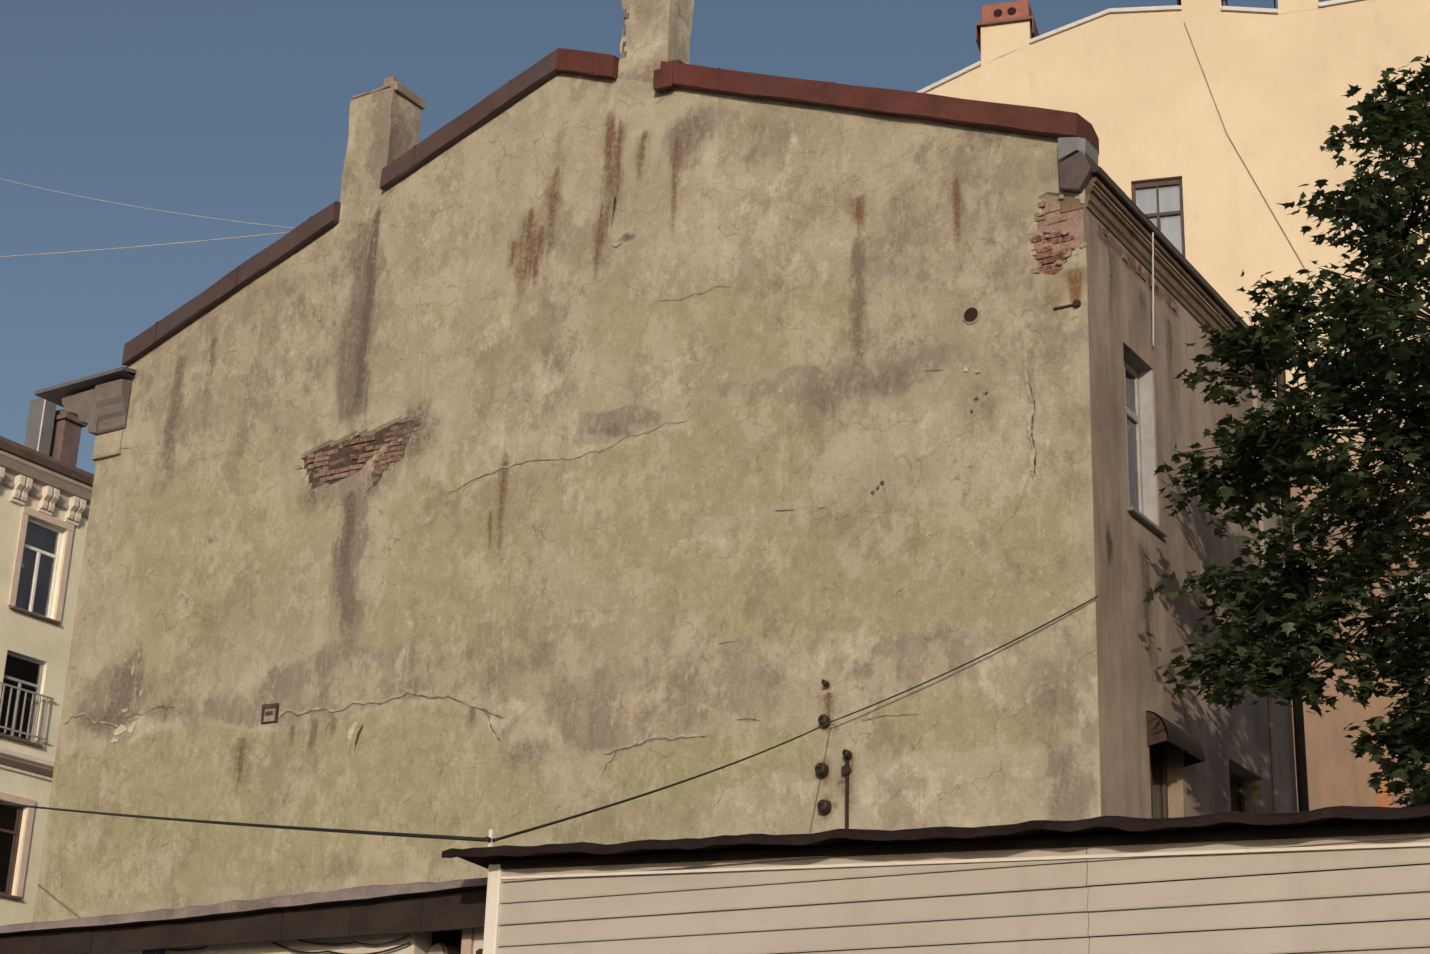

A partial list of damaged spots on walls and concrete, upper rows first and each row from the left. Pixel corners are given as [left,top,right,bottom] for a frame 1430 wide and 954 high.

corrosion [606,117,621,190]
corrosion [511,171,557,279]
flaking render [1031,194,1178,315]
water stain [339,210,380,416]
flaking render [296,407,430,503]
crack [449,415,692,493]
water stain [334,493,355,633]
crack [63,705,174,728]
crack [278,689,505,741]
crack [601,718,760,779]